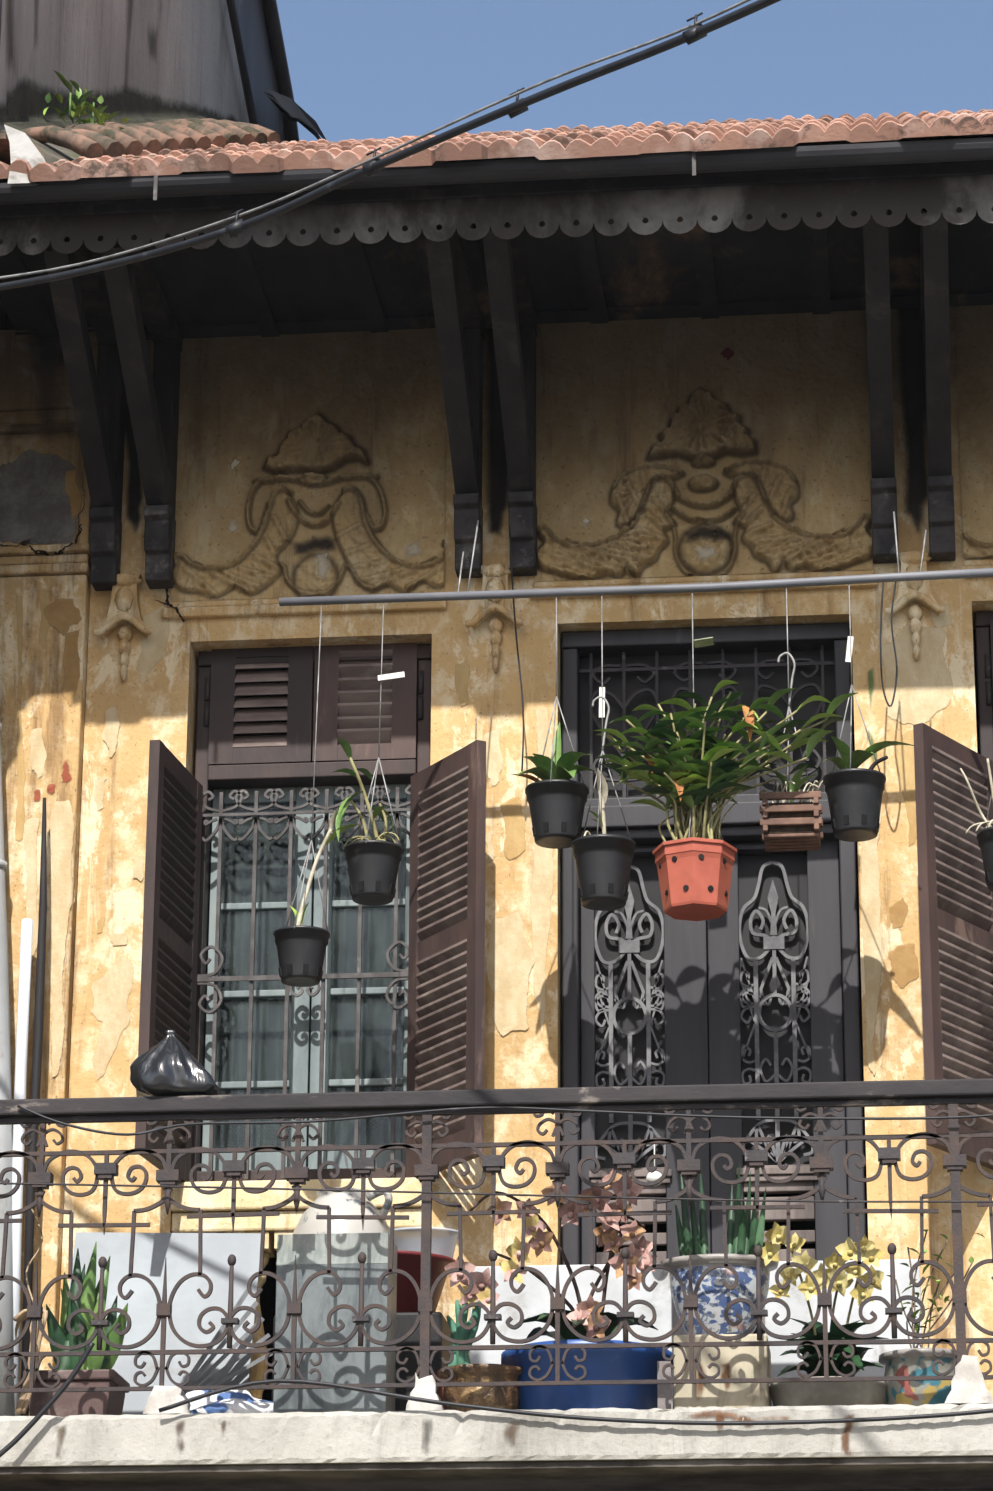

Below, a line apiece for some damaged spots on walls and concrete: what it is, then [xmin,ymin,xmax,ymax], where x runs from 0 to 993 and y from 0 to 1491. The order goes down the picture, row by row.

flaking render [0,422,82,548]
peeling [879,604,953,846]
peeling [861,804,919,1075]
rust [691,1411,754,1427]
rust [842,1416,852,1453]